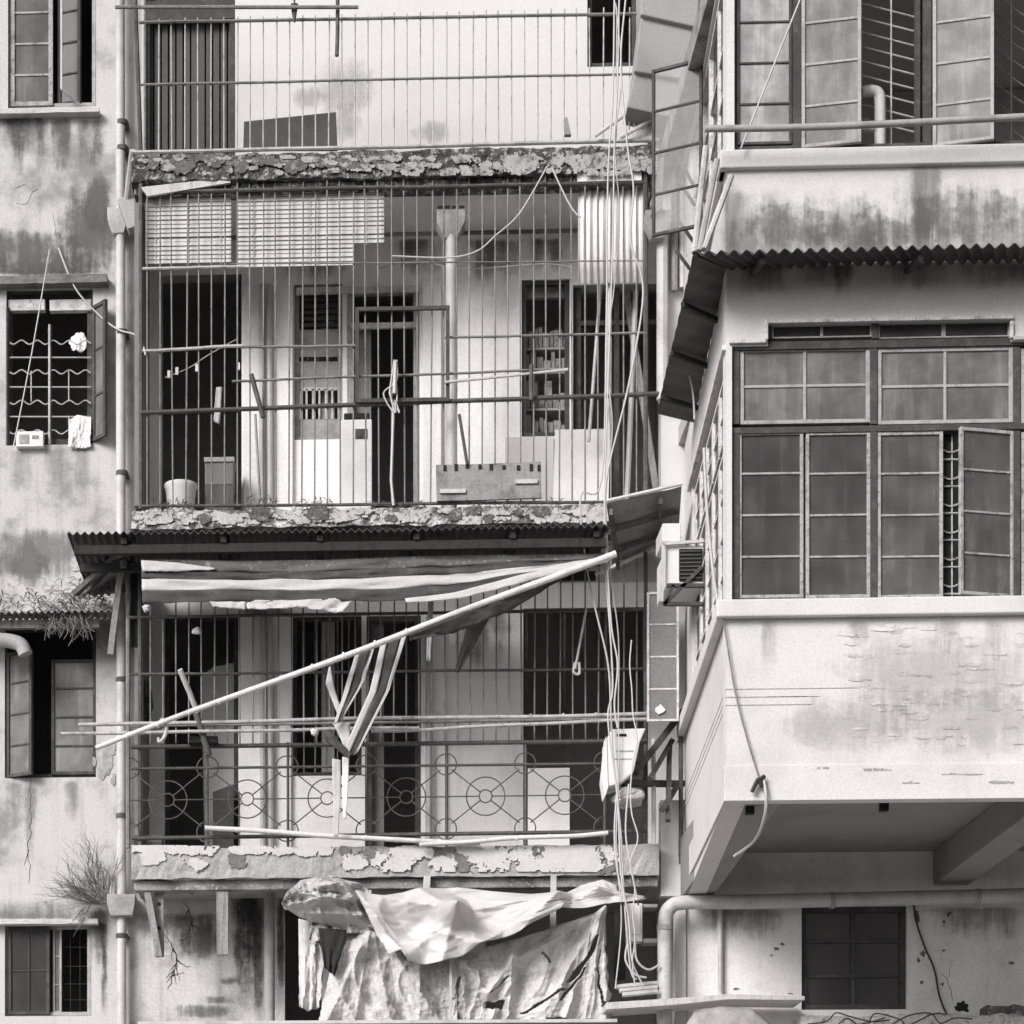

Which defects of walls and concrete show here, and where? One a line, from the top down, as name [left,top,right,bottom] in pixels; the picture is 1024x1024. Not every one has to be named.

leakage [3,118,102,157]
peeling [138,151,658,177]
leakage [0,177,113,276]
peeling [133,505,609,525]
peeling [837,622,1024,747]
peeling [942,773,1014,784]
crack [24,780,32,879]
peeling [131,845,622,876]
leakage [223,898,263,1005]
leakage [189,997,225,1017]